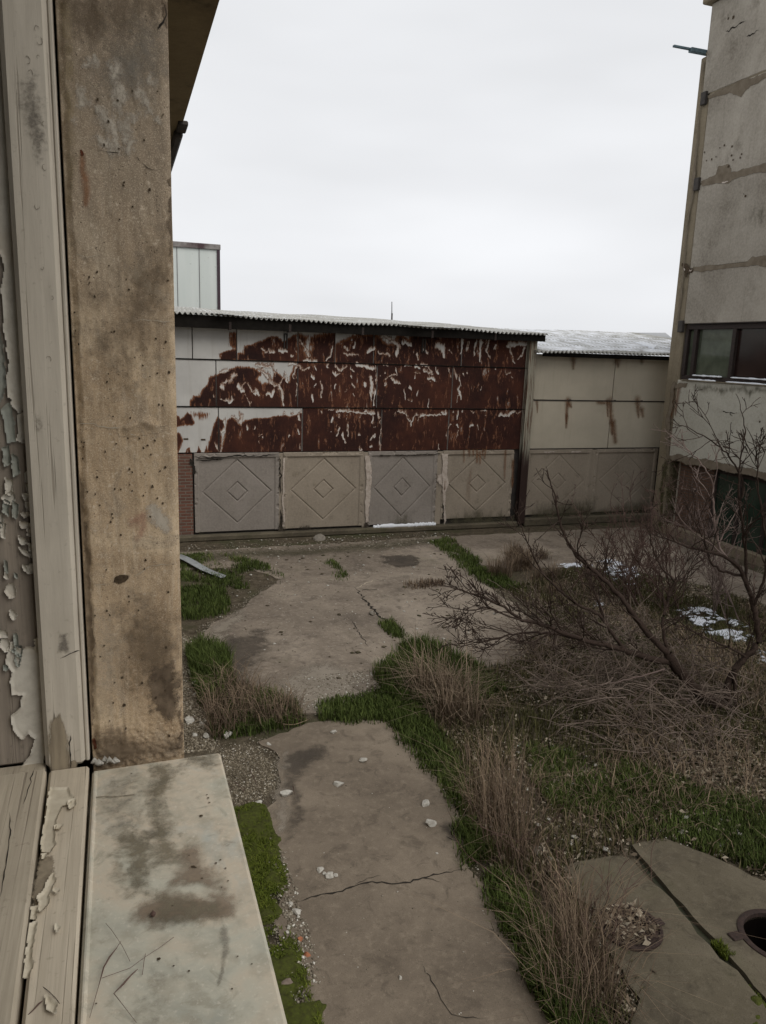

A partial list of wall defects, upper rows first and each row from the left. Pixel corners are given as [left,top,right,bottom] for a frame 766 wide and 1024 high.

spalling [676,61,766,324]
peeling [0,52,77,771]
corrosion [177,331,527,487]
crack [354,579,387,645]
leakage [95,732,155,766]
peeling [23,787,77,979]
leakage [96,765,234,983]
crack [294,869,461,903]